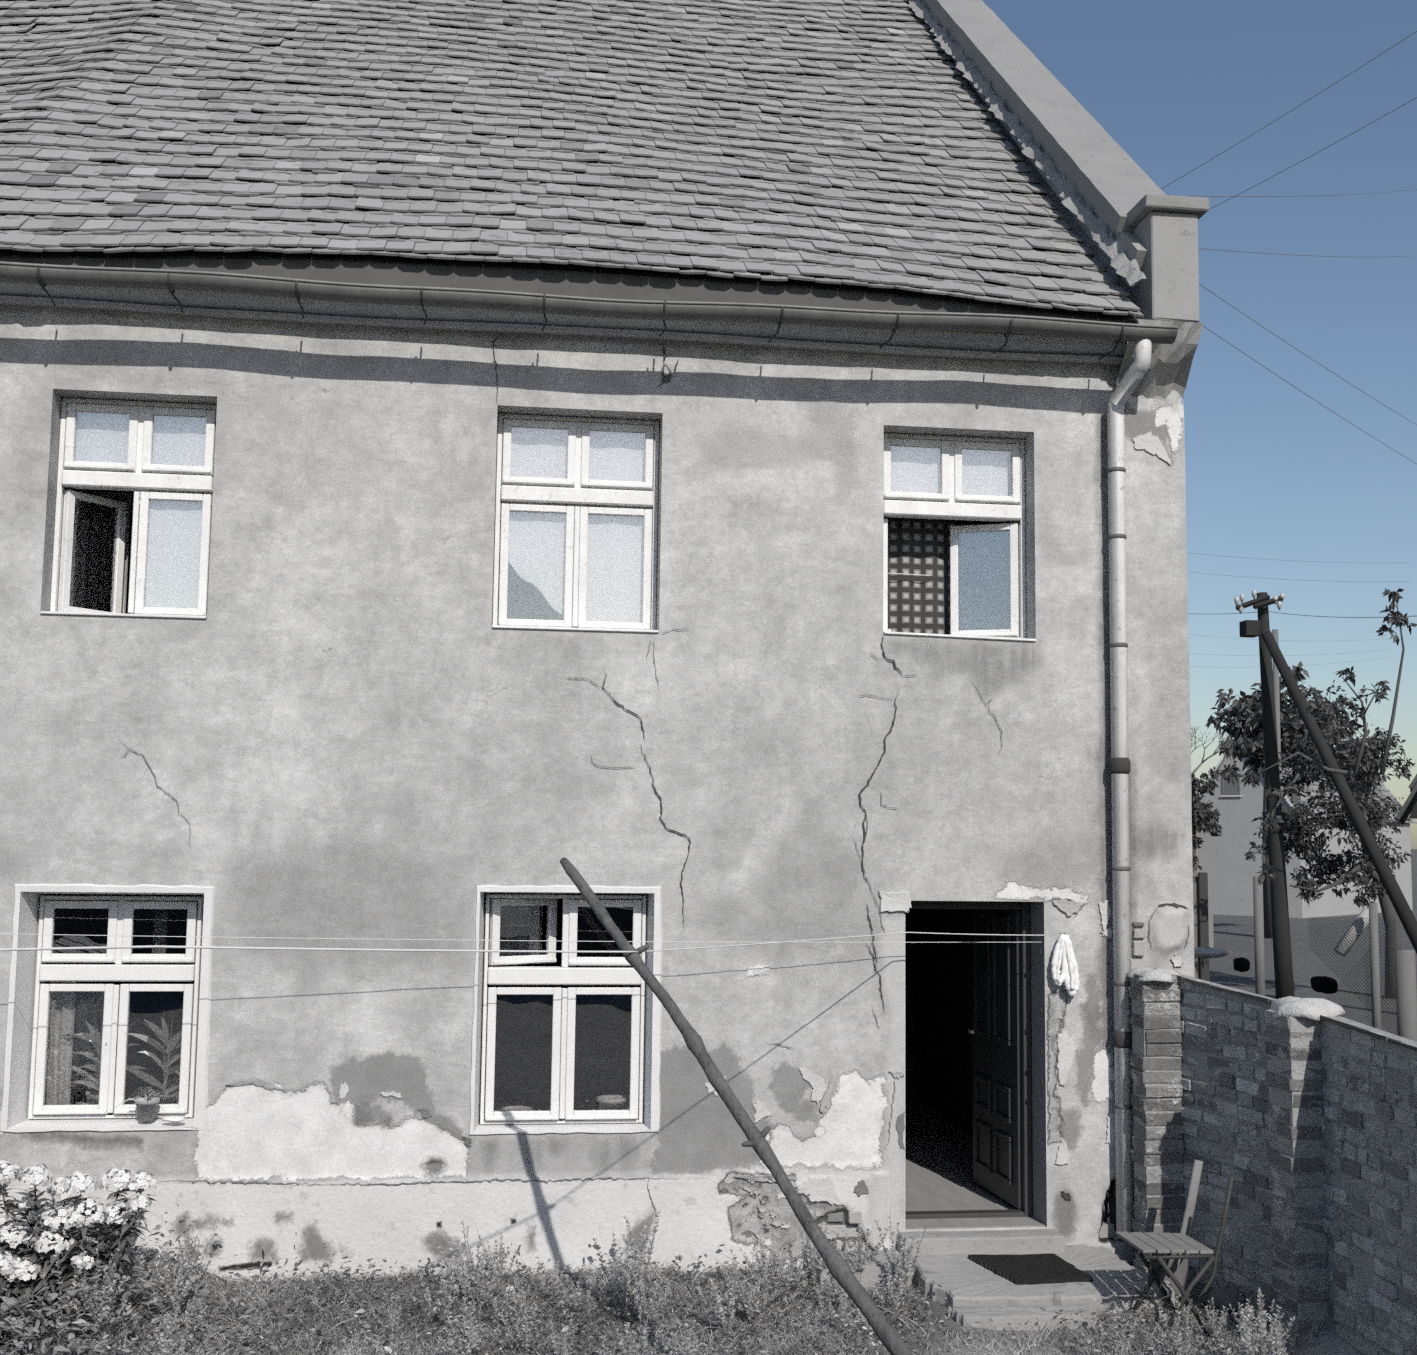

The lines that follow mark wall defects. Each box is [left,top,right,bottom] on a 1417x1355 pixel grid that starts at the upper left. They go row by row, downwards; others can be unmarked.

peeling [1124,390,1184,466]
crack [562,668,691,923]
crack [853,640,917,1031]
peeling [193,1052,472,1187]
peeling [650,891,912,1261]
crack [884,1078,896,1148]
peeling [1047,990,1076,1165]
peeling [1090,1048,1115,1147]